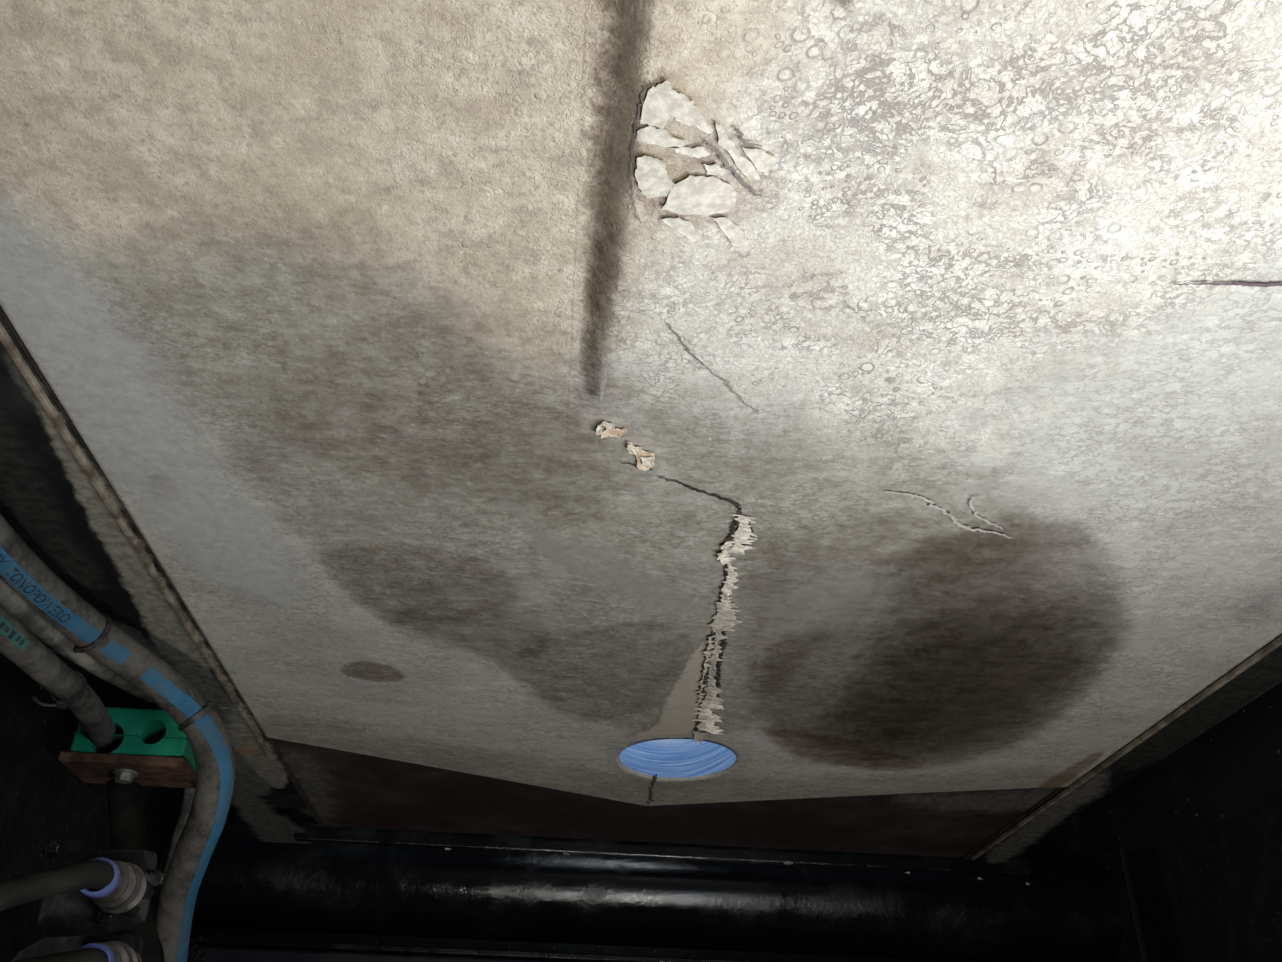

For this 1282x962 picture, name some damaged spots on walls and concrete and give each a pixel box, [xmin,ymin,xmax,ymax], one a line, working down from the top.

peeling [629,80,779,251]
water stain [0,352,335,844]
peeling [595,421,655,471]
crack [621,462,757,744]
crack [667,324,758,411]
crack [886,491,1013,538]
crack [647,774,657,805]
water stain [897,648,1282,863]